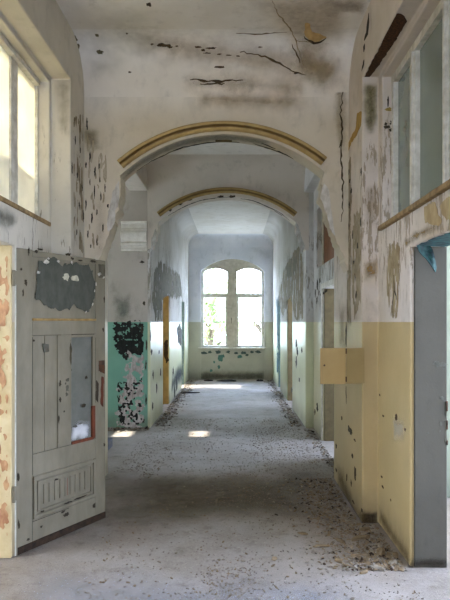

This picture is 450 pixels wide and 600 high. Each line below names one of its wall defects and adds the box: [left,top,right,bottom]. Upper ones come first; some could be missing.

crack [236,1,308,75]
crack [190,78,241,86]
leakage [366,86,376,127]
crack [337,92,345,221]
peeling [35,114,120,313]
peeling [347,157,361,323]
peeling [0,256,9,326]
peeling [143,260,182,322]
peeling [387,241,400,318]
peeling [0,335,10,415]
peeling [112,320,169,428]
peeling [201,350,261,372]